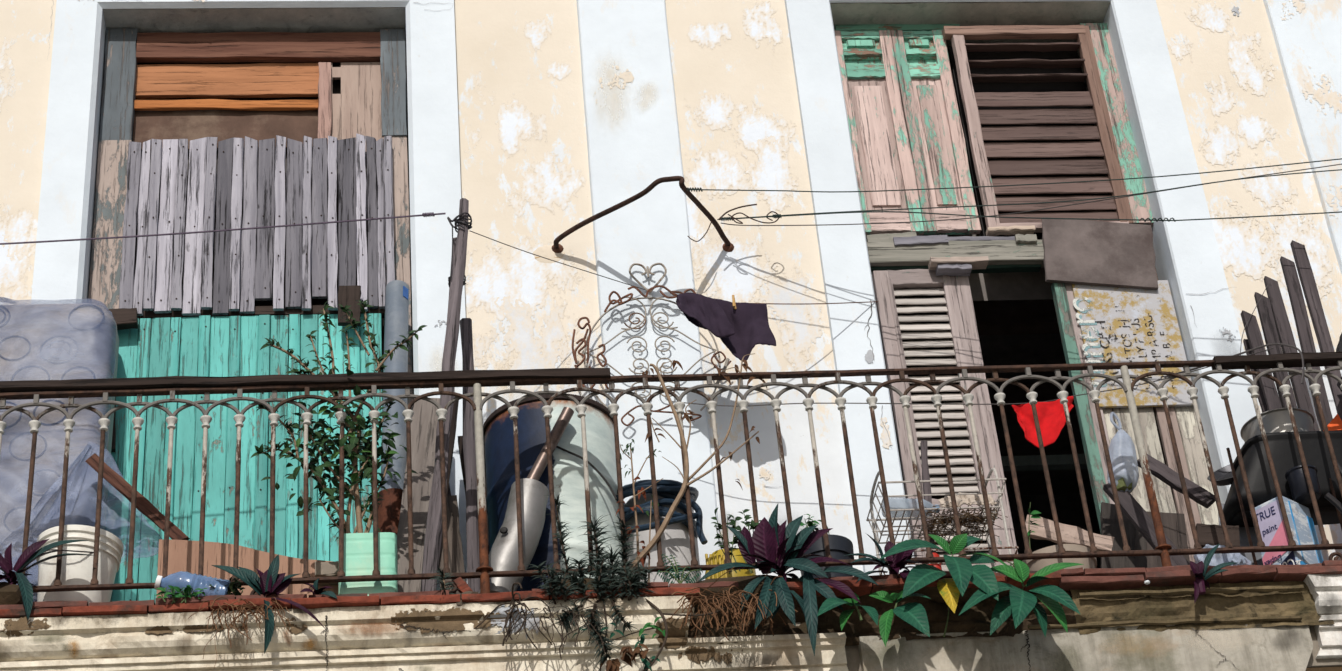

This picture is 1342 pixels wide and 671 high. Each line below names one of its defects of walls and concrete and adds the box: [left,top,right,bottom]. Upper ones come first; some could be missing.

peeling [687,0,783,51]
peeling [1302,66,1342,117]
peeling [496,93,587,214]
peeling [1184,0,1333,307]
peeling [0,202,38,305]
peeling [684,93,825,371]
spalling [391,605,540,640]
spalling [655,617,743,664]